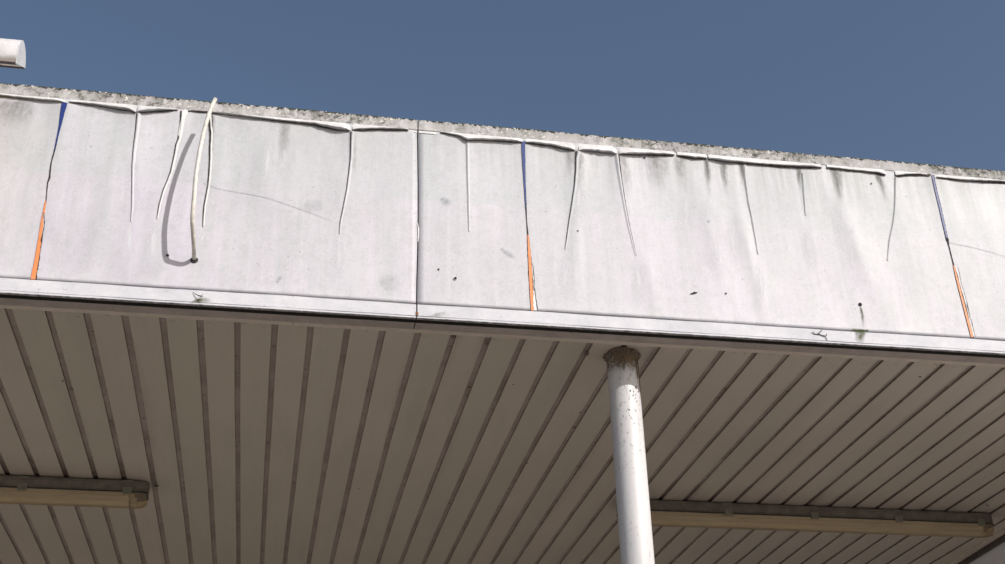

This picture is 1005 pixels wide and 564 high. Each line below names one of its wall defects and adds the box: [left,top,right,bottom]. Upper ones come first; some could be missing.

crack [130,112,142,221]
crack [157,109,213,226]
crack [339,131,355,234]
crack [565,150,581,249]
crack [614,153,637,256]
crack [743,164,759,254]
crack [887,177,898,261]